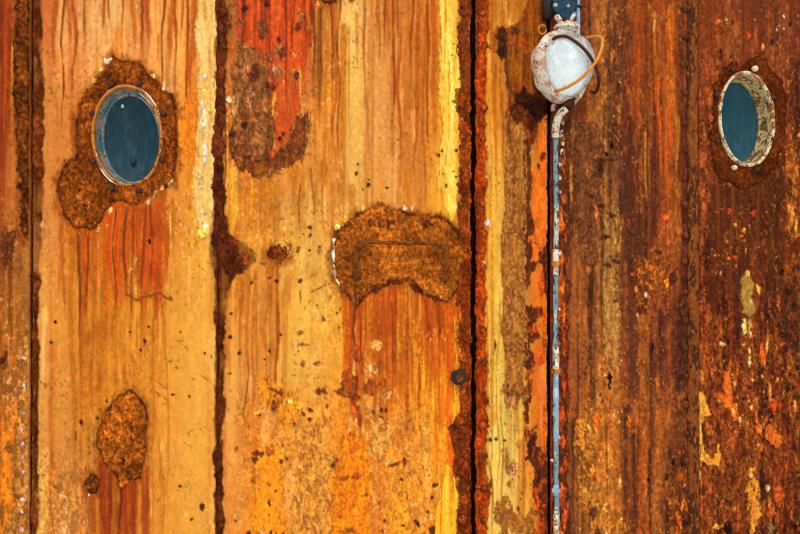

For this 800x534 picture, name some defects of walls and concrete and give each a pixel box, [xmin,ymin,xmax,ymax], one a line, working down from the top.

corrosion [0,0,85,534]
corrosion [54,0,196,534]
corrosion [296,0,539,534]
peeling [487,0,552,534]
corrosion [550,117,573,534]
corrosion [617,0,677,392]
corrosion [665,439,689,534]
corrosion [708,49,800,507]